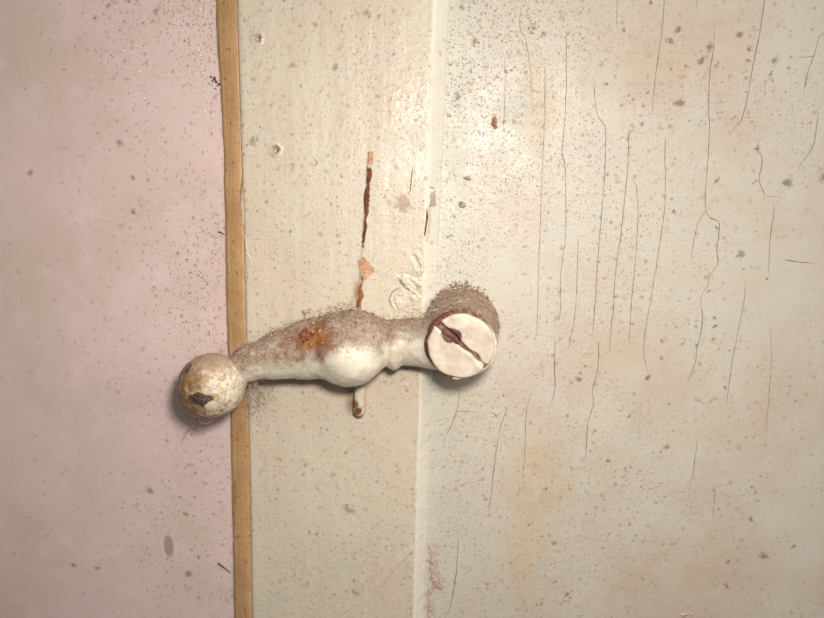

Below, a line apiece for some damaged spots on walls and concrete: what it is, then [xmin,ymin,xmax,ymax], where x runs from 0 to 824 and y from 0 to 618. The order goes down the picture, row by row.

crack [732,0,766,144]
crack [798,33,824,179]
corrosion [356,276,364,309]
corrosion [362,151,373,248]
peeling [395,194,411,213]
crack [488,0,667,517]
crack [685,20,721,395]
crack [726,277,747,411]
crack [757,133,776,279]